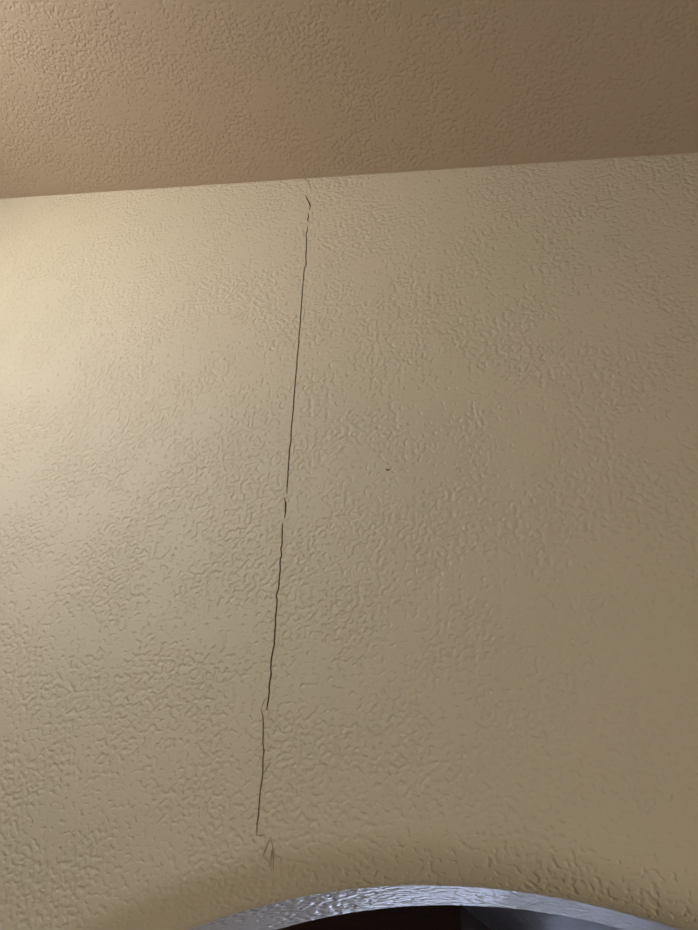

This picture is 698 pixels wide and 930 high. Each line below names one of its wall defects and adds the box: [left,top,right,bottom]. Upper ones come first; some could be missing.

crack [256,179,313,871]